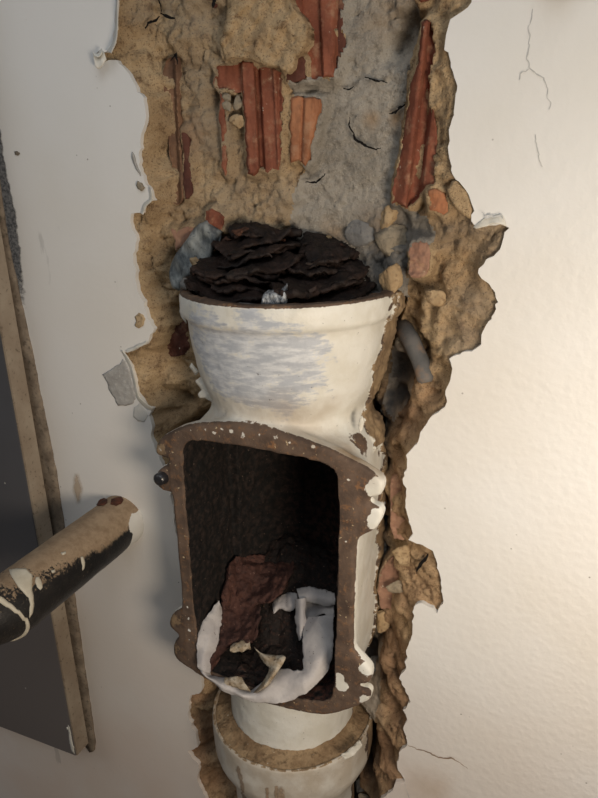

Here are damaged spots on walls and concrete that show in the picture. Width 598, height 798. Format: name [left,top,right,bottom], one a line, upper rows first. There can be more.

crack [519,9,551,109]
flaking render [93,0,509,798]
crack [410,746,468,769]